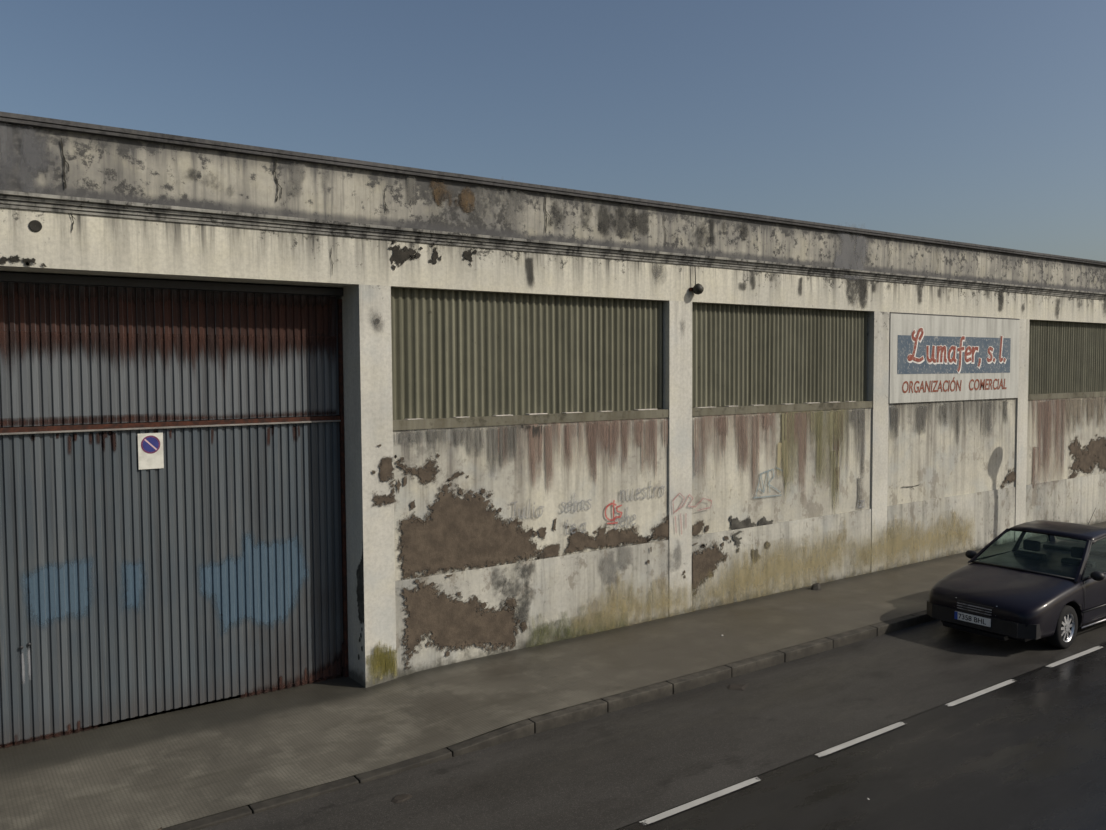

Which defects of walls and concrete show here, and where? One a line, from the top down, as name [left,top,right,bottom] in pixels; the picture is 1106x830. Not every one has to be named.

damp [0,122,57,192]
rust [0,282,337,361]
damp [814,408,865,507]
damp [891,399,1007,440]
peeling [1068,434,1106,479]
peeling [372,444,669,669]
peeling [682,516,773,595]